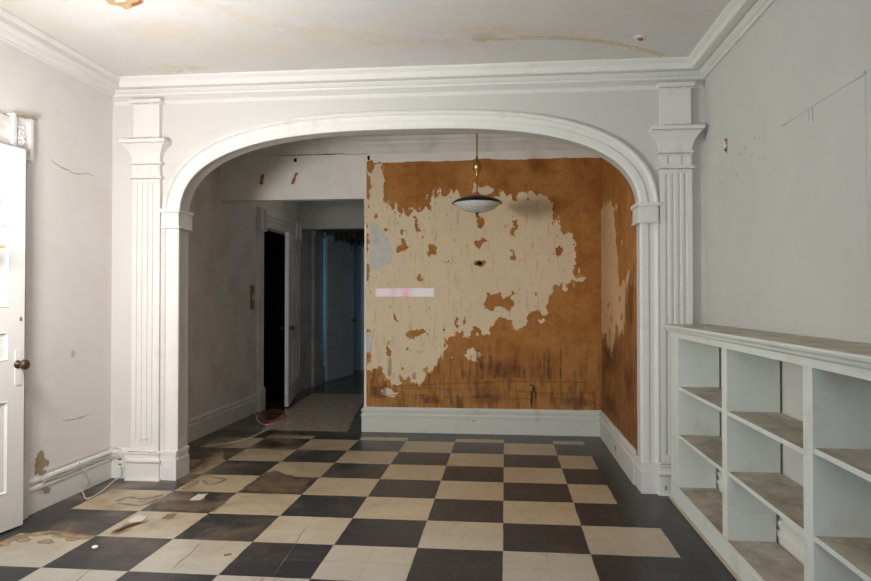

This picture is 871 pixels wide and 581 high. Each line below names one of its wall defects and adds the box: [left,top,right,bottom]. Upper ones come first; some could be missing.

flaking render [106,0,144,9]
peeling [474,216,488,249]
peeling [405,329,428,351]
flaking render [35,451,49,476]